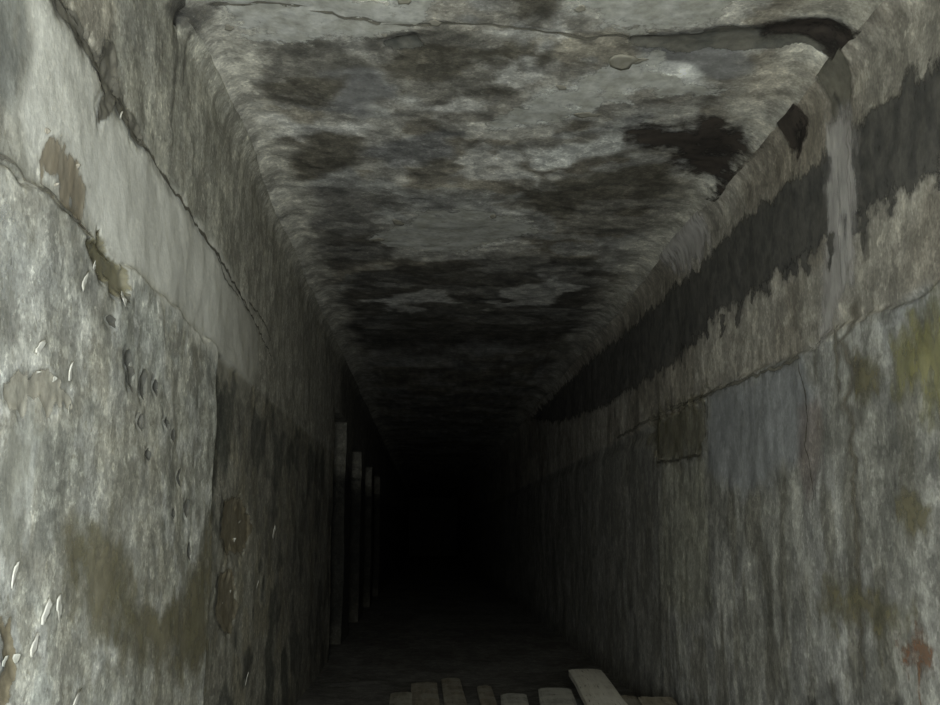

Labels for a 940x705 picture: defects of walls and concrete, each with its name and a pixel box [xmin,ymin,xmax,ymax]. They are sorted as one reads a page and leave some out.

peeling [0,128,132,307]
crack [52,0,274,363]
peeling [3,361,74,418]
spalling [124,349,158,400]
leakage [530,48,940,677]
spalling [11,561,20,589]
peeling [0,593,63,705]
spalling [65,496,253,684]